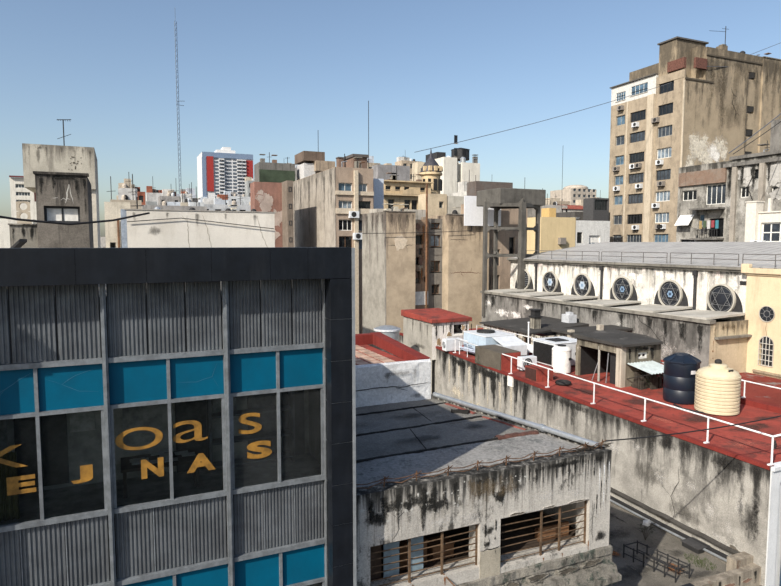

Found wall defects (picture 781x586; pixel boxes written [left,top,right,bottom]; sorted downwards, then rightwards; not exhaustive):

water stain [39,176,86,209]
flaking render [255,189,282,242]
flaking render [678,136,728,187]
spalling [738,165,755,187]
spalling [766,161,781,201]
water stain [443,353,528,419]
water stain [537,390,588,421]
water stain [366,482,457,530]
water stain [492,478,505,506]
water stain [522,456,610,513]
water stain [715,456,743,479]
water stain [740,467,761,532]